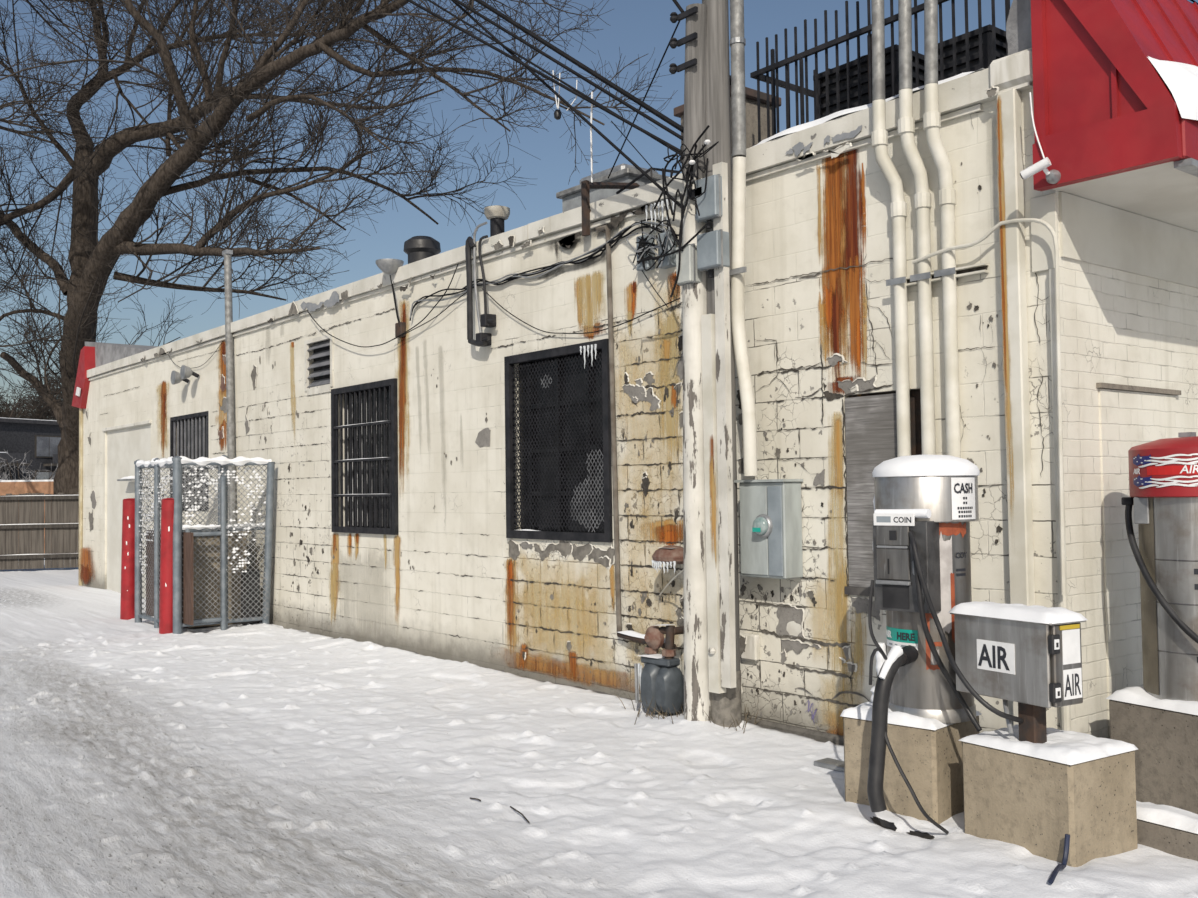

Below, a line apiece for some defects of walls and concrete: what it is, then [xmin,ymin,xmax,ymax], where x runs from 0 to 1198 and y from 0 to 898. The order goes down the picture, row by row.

peeling [785,125,862,162]
corrosion [817,149,867,393]
corrosion [997,97,1014,506]
corrosion [157,381,169,455]
corrosion [397,301,409,477]
peeling [622,334,683,428]
crack [746,254,893,706]
peeling [823,375,877,401]
crack [1034,273,1053,475]
corrosion [506,558,527,668]
spalling [626,580,684,671]
peeling [739,567,822,695]